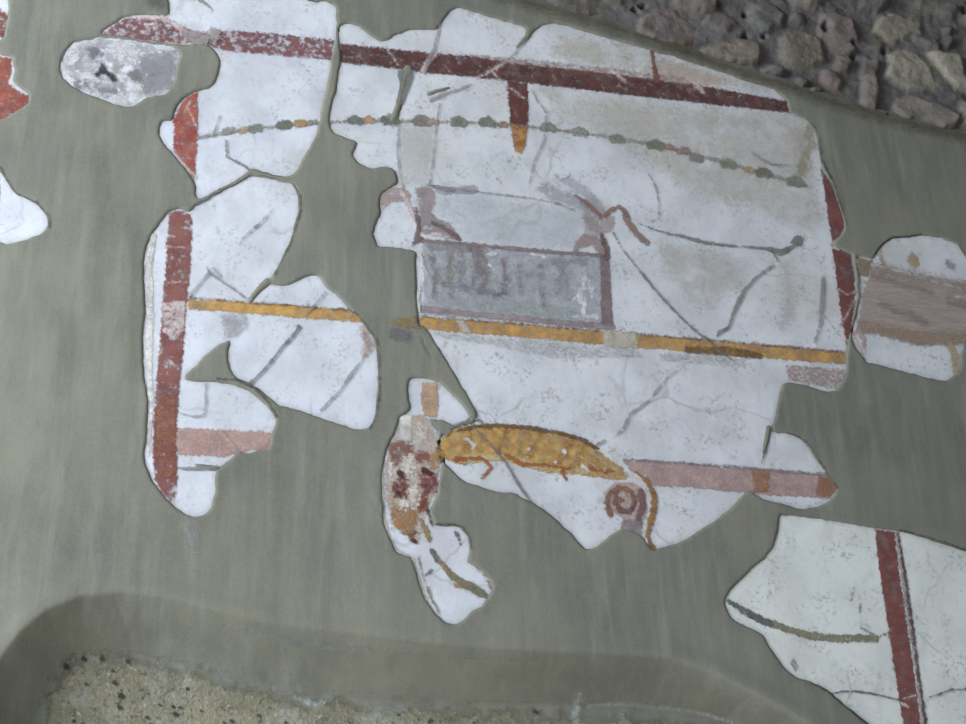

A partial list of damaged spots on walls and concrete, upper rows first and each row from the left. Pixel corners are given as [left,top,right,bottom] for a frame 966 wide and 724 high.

flaking render [396,69,413,104]
crack [428,84,573,210]
crack [188,267,246,298]
crack [612,174,795,360]
crack [814,276,825,343]
crack [185,292,326,417]
crack [320,312,381,428]
crack [596,371,677,445]
crack [179,431,240,470]
crack [452,416,531,502]
crack [762,434,838,489]
spalling [46,651,669,724]